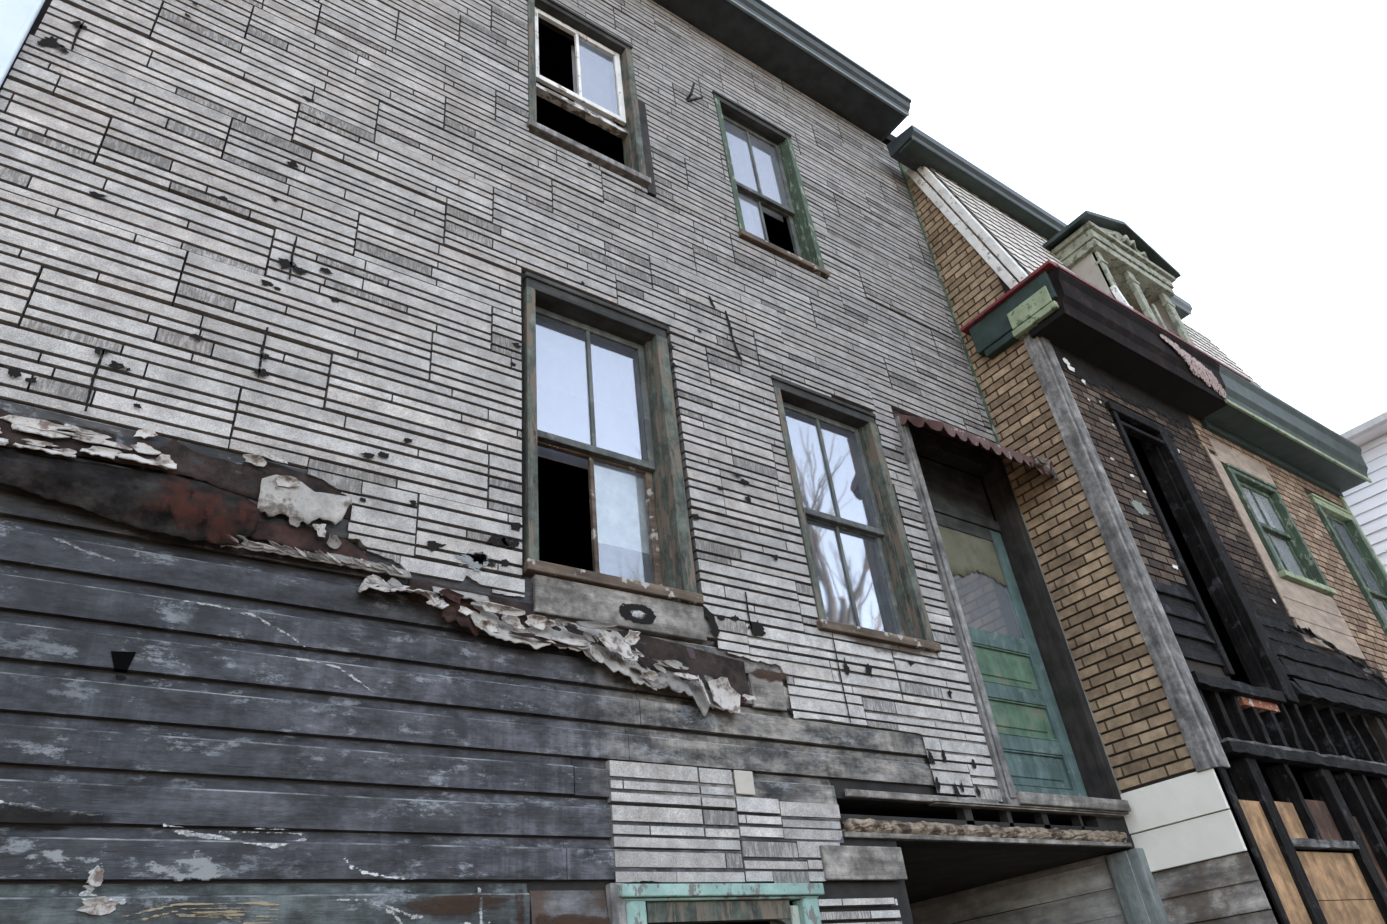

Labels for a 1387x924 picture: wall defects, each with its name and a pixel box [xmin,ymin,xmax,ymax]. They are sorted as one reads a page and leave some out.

spalling [8,367,37,383]
spalling [252,352,270,377]
peeling [0,398,300,501]
spalling [360,451,389,459]
peeling [289,516,342,549]
spalling [427,541,446,552]
spalling [467,522,521,567]
spalling [717,614,766,636]
peeling [361,574,757,713]
spalling [840,818,1128,842]
peeling [26,850,127,916]